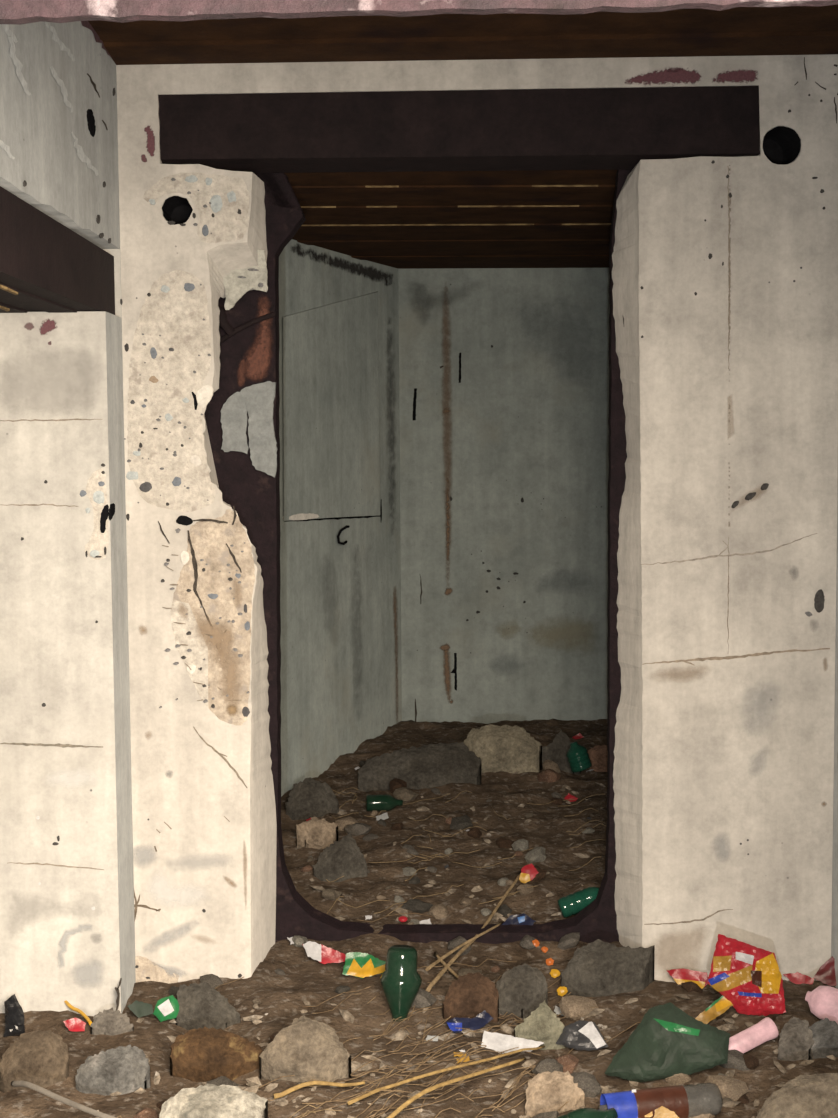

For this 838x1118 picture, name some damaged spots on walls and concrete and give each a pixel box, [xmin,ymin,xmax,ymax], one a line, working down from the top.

spalling [143,172,249,243]
corrosion [238,298,271,386]
corrosion [443,300,451,560]
spalling [80,463,130,560]
spalling [124,249,278,726]
crack [158,506,247,788]
corrosion [440,645,453,703]